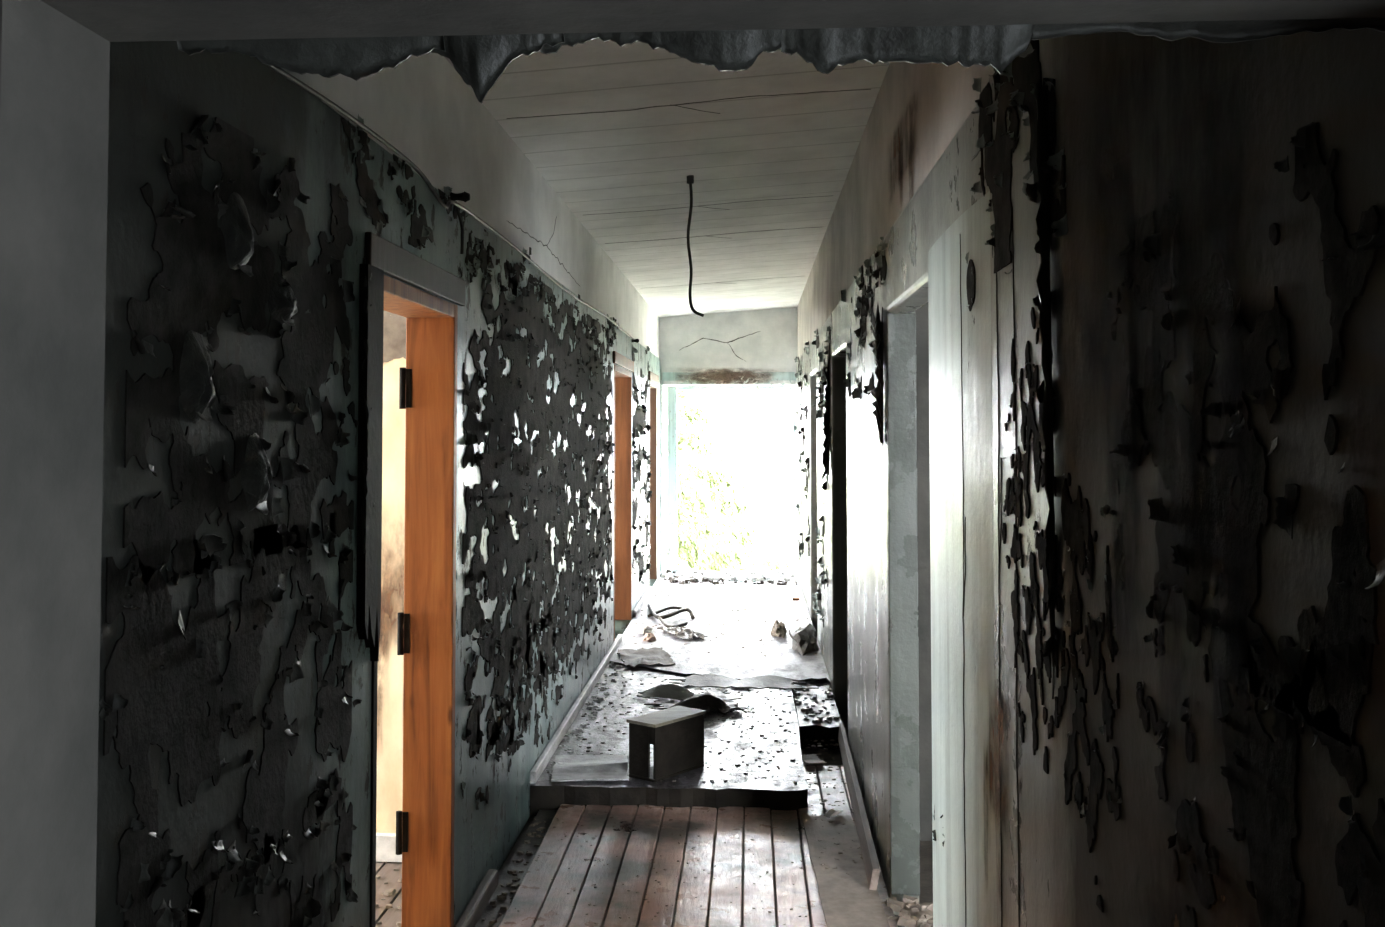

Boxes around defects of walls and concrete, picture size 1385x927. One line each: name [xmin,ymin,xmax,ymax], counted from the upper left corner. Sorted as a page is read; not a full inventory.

peeling [438,186,620,772]
peeling [632,346,688,585]
crack [679,331,761,361]
peeling [715,237,888,628]
peeling [1002,307,1123,853]
peeling [461,781,491,810]